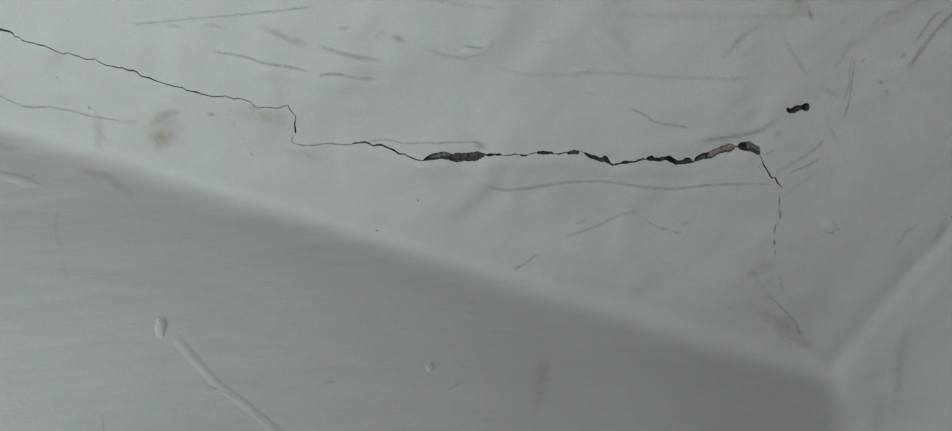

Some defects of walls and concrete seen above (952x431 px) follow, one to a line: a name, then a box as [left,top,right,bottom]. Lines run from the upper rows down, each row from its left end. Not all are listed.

crack [0,28,296,143]
crack [352,141,782,187]